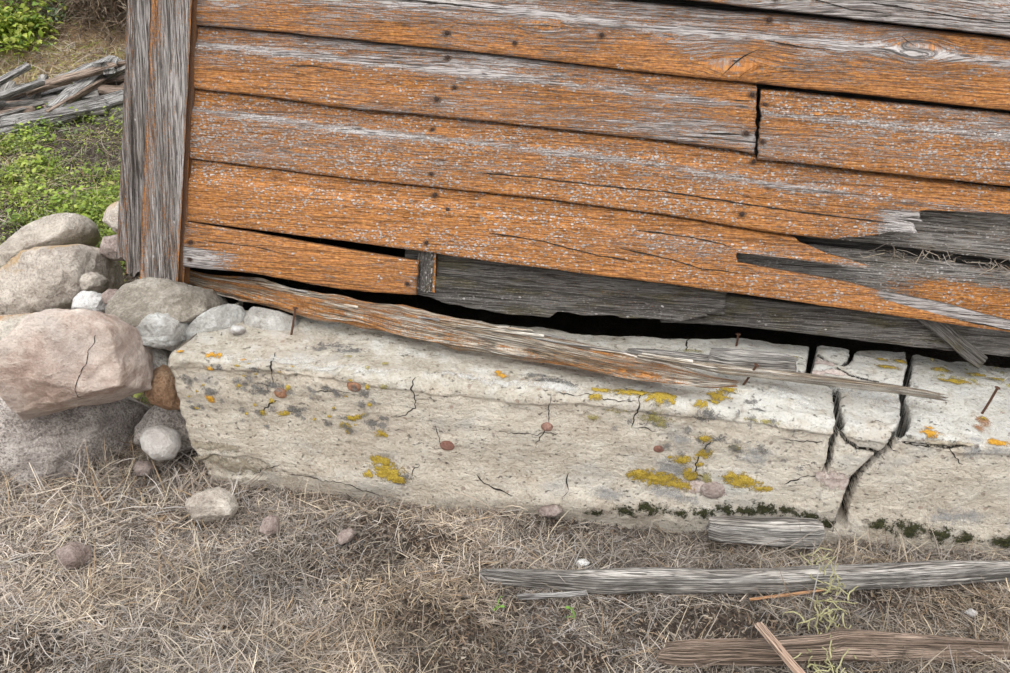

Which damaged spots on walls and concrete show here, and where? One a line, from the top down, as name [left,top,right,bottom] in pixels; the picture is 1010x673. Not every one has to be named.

crack [780,352,964,514]